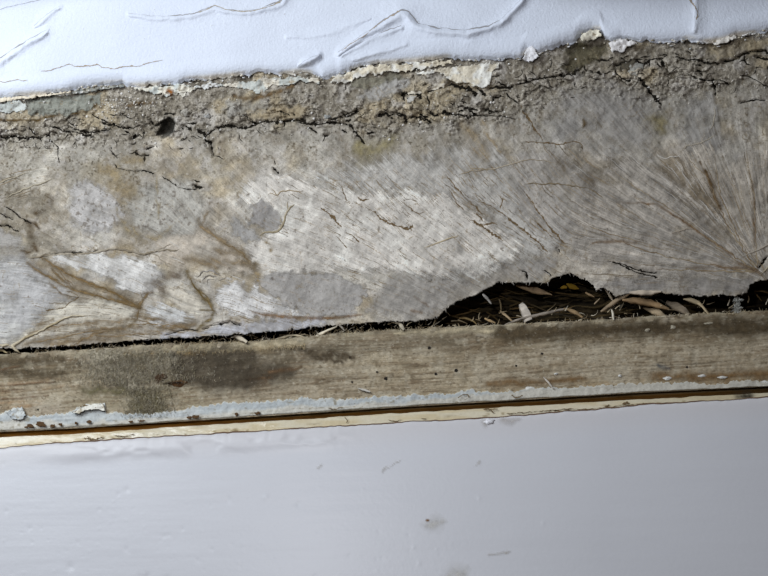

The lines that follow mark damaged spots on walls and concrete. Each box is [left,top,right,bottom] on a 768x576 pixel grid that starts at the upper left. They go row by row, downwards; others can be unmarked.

spalling [0,29,768,149]
crack [0,49,768,190]
water stain [185,212,260,282]
water stain [1,243,307,420]